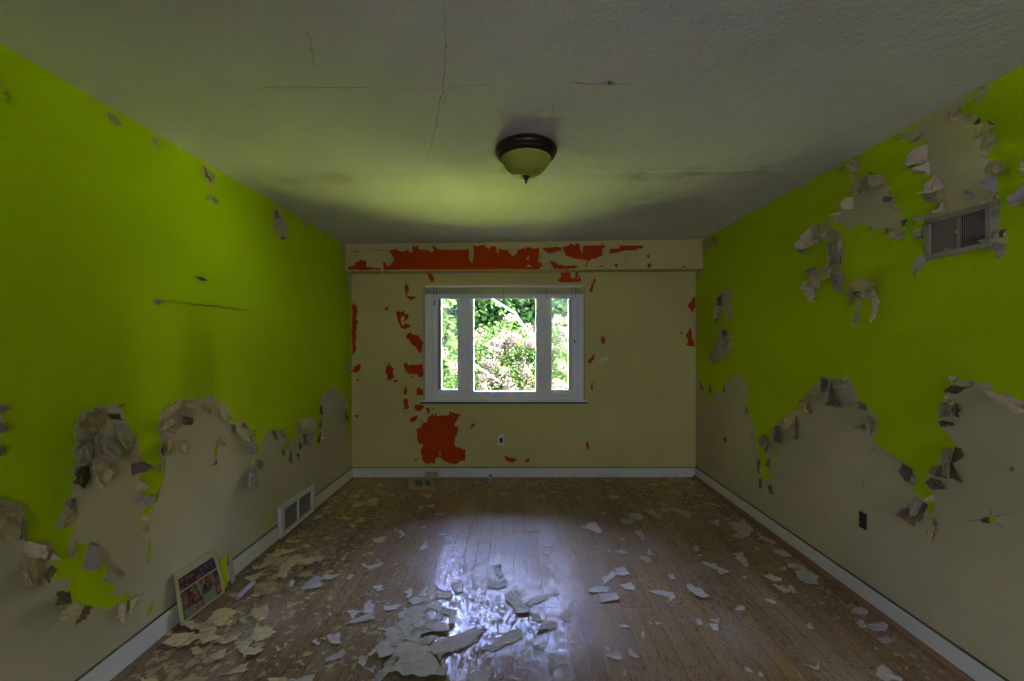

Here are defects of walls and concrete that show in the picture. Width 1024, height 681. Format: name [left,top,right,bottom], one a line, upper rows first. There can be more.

peeling [201,165,219,204]
peeling [274,207,288,240]
peeling [794,86,1024,328]
peeling [339,242,651,464]
peeling [0,385,359,681]
peeling [693,369,1024,681]